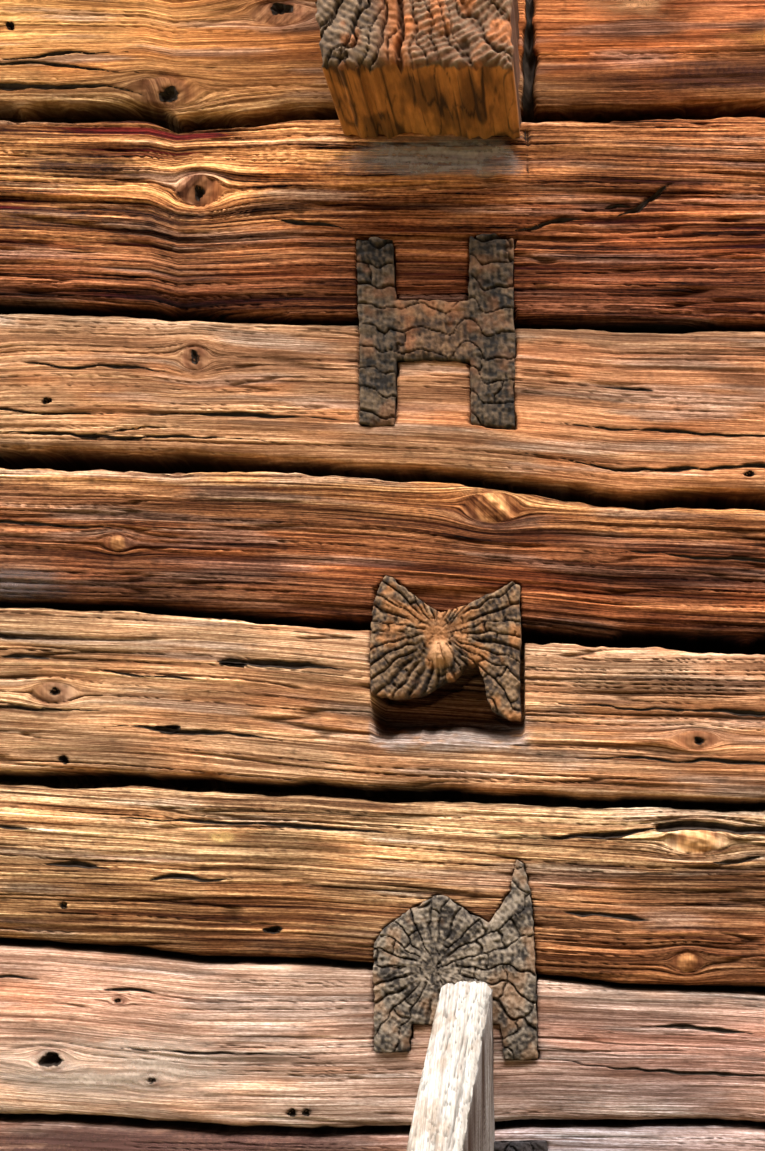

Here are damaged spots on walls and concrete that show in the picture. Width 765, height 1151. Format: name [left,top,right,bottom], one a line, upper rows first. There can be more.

crack [0,51,142,95]
crack [96,660,348,679]
crack [564,1024,765,1076]